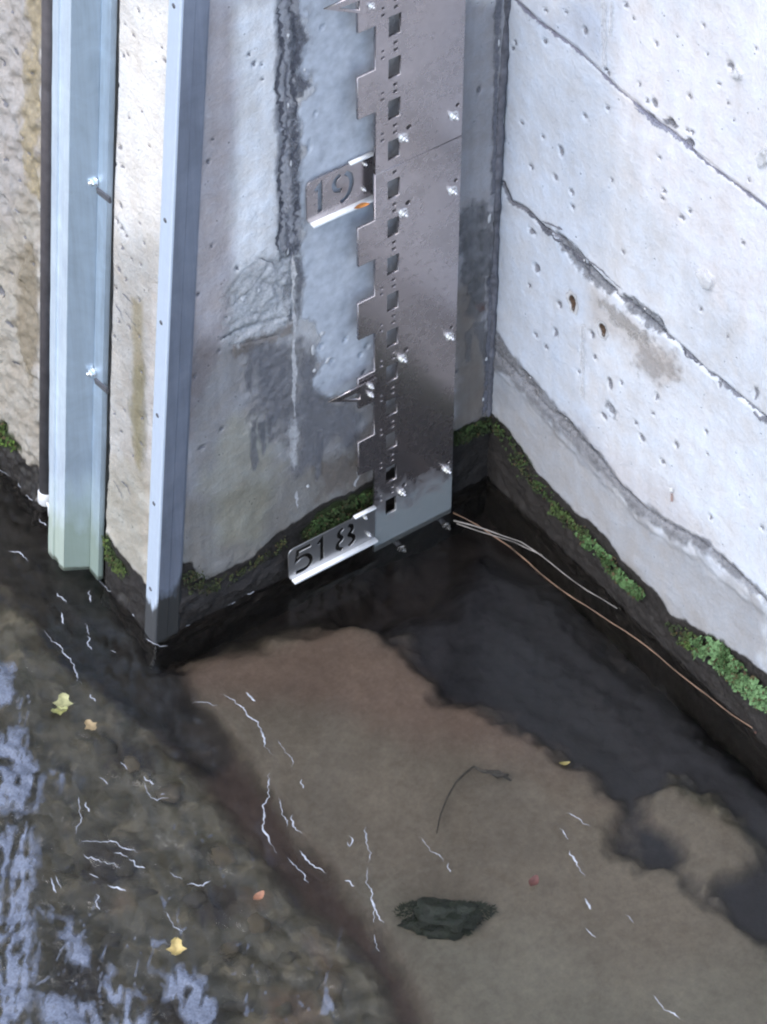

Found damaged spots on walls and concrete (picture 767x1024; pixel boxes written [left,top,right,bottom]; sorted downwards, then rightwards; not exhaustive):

crack [274,0,310,293]
damp [288,15,310,205]
crack [488,0,767,423]
damp [179,244,373,630]
damp [386,496,395,513]
crack [482,274,492,415]
damp [452,414,767,746]
damp [493,335,767,600]
crack [590,444,765,598]